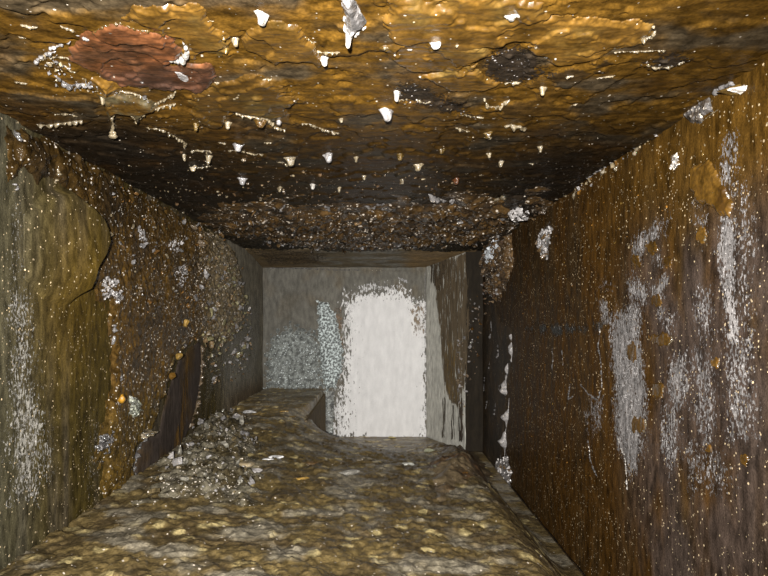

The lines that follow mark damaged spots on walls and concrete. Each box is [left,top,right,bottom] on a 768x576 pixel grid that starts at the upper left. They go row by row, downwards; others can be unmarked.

damp [341,0,367,38]
crack [712,81,735,96]
crack [563,134,658,200]
spalling [494,194,536,222]
damp [2,126,561,509]
damp [597,213,680,480]
damp [658,127,762,496]
spalling [133,341,207,475]
damp [583,399,602,438]